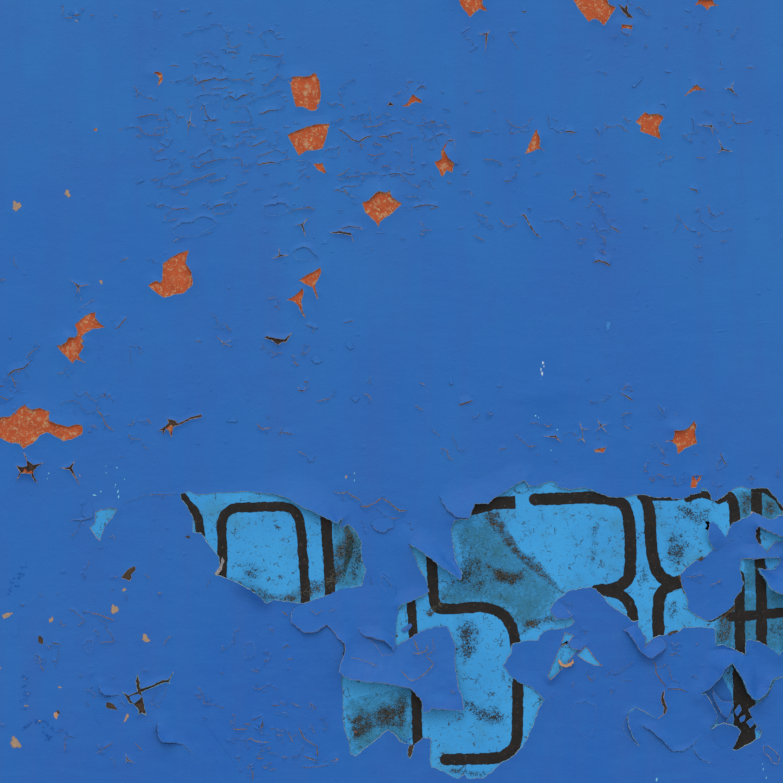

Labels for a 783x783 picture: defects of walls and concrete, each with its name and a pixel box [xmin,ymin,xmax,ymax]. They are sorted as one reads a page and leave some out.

peeling [273,60,340,186]
peeling [423,126,472,189]
peeling [326,172,414,247]
peeling [171,402,783,783]
peeling [98,666,178,721]